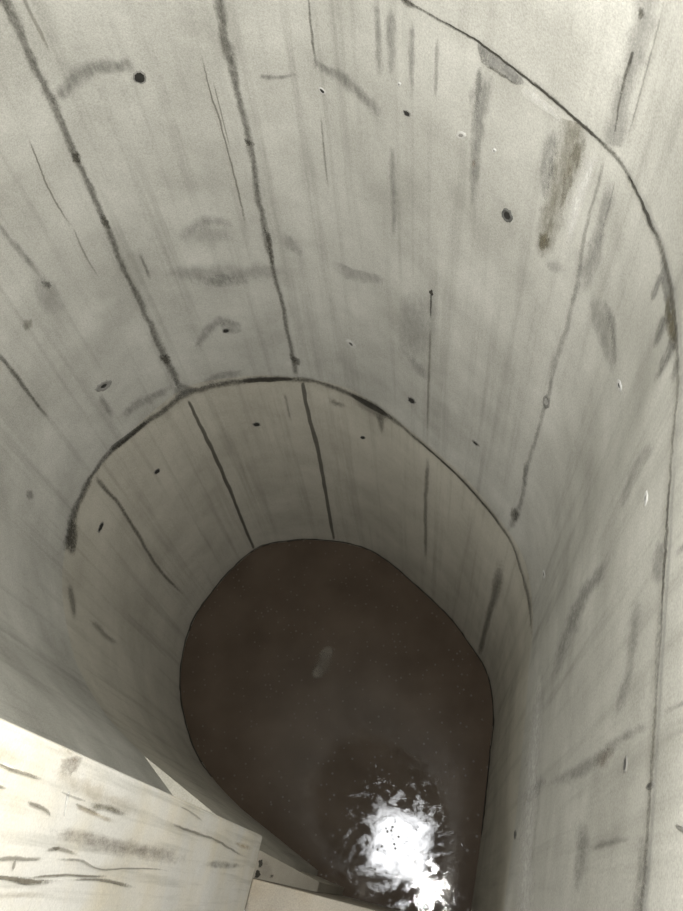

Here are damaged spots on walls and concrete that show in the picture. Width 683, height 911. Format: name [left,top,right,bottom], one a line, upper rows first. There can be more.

crack [33,151,62,212]
crack [206,76,242,206]
leakage [540,130,579,248]